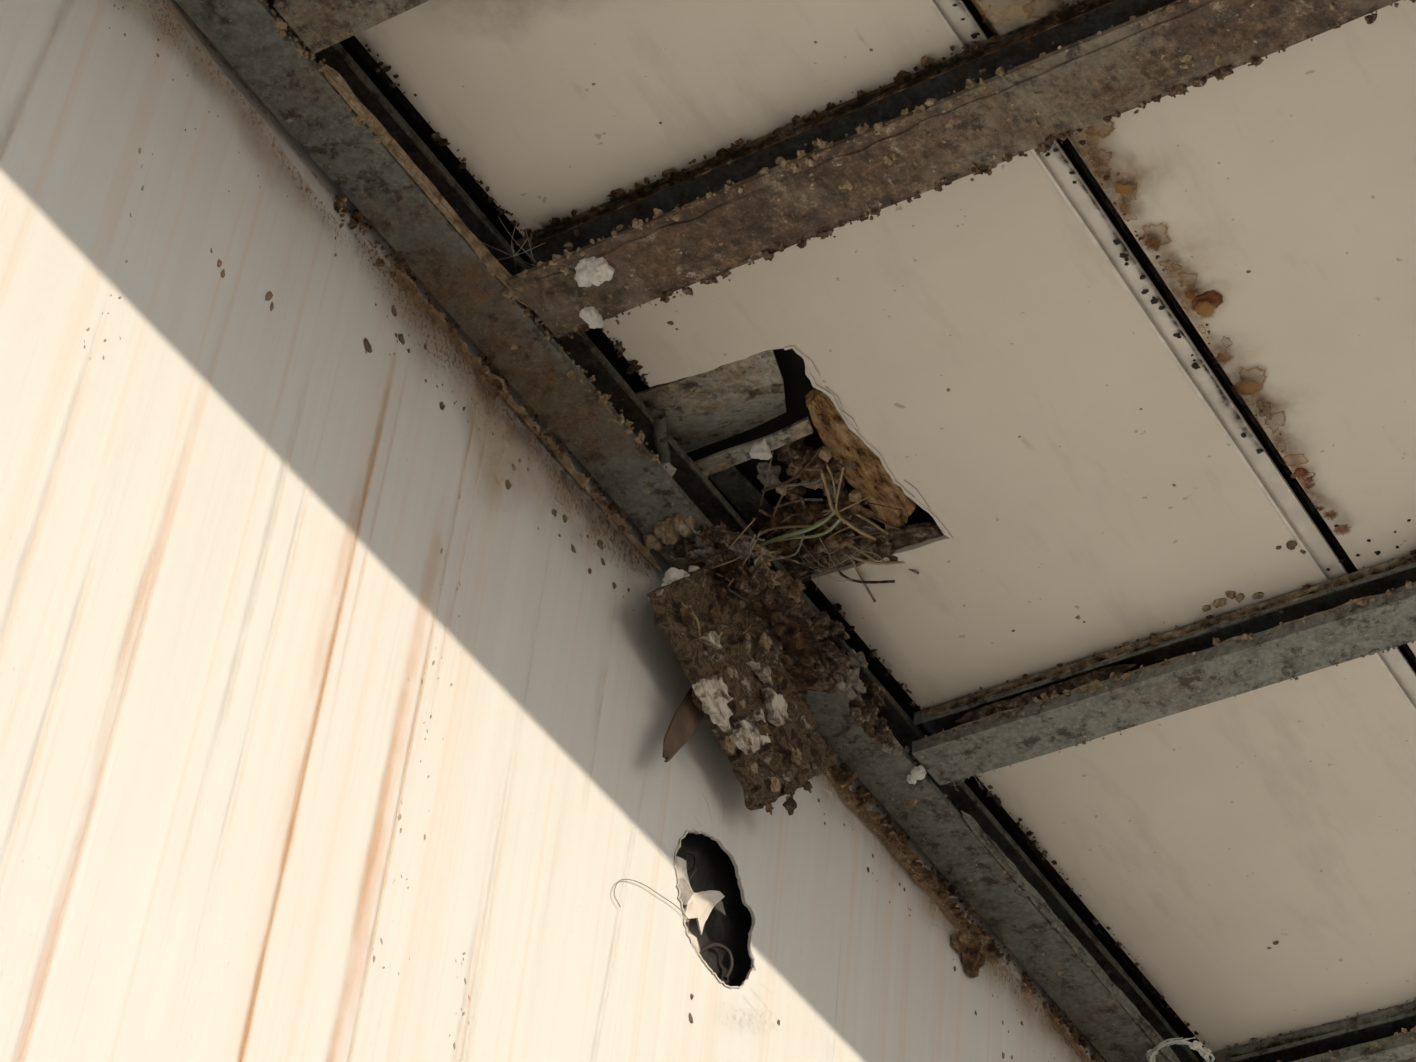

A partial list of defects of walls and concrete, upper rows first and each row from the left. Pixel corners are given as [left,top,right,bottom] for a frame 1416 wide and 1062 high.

hole [778,345,953,591]